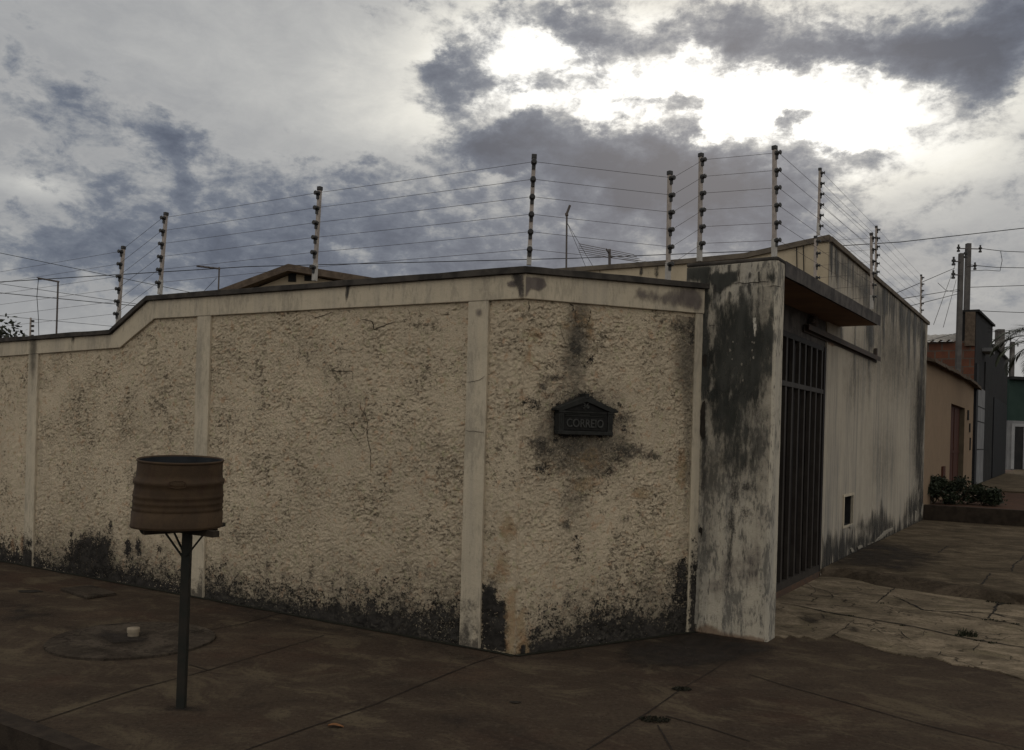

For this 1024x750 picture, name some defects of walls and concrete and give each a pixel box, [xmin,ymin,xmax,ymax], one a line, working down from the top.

damp [508,274,546,296]
crack [329,370,371,472]
damp [528,438,558,475]
damp [701,383,758,490]
damp [821,243,926,569]
damp [0,518,688,654]
crack [783,555,1024,655]